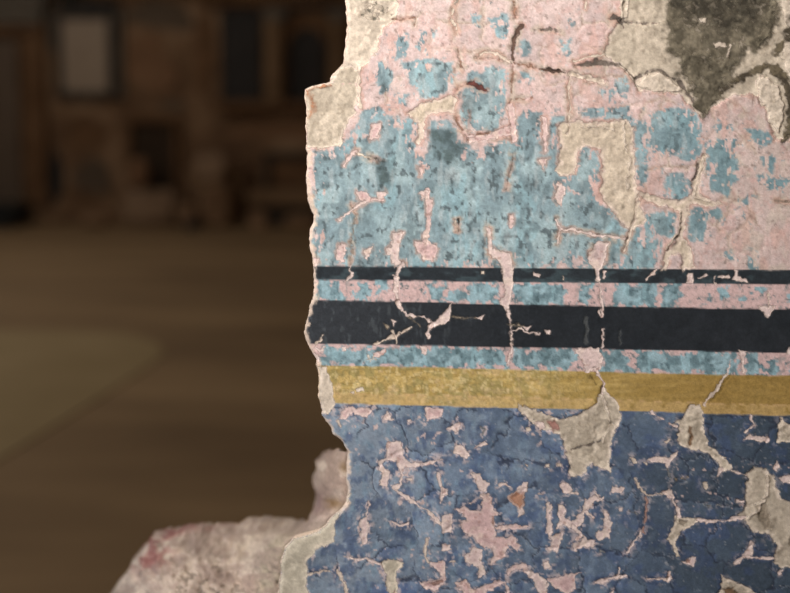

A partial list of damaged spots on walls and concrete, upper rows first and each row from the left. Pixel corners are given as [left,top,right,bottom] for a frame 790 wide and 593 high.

flaking render [225,0,399,149]
crack [459,1,694,104]
water stain [666,0,790,143]
flaking render [538,116,747,285]
crack [374,262,484,345]
crack [485,227,550,365]
peeling [313,335,372,427]
spalling [112,448,350,593]
peeling [378,441,580,593]
flaking render [518,387,625,553]
flaking render [630,404,790,568]
flaking render [719,574,755,593]